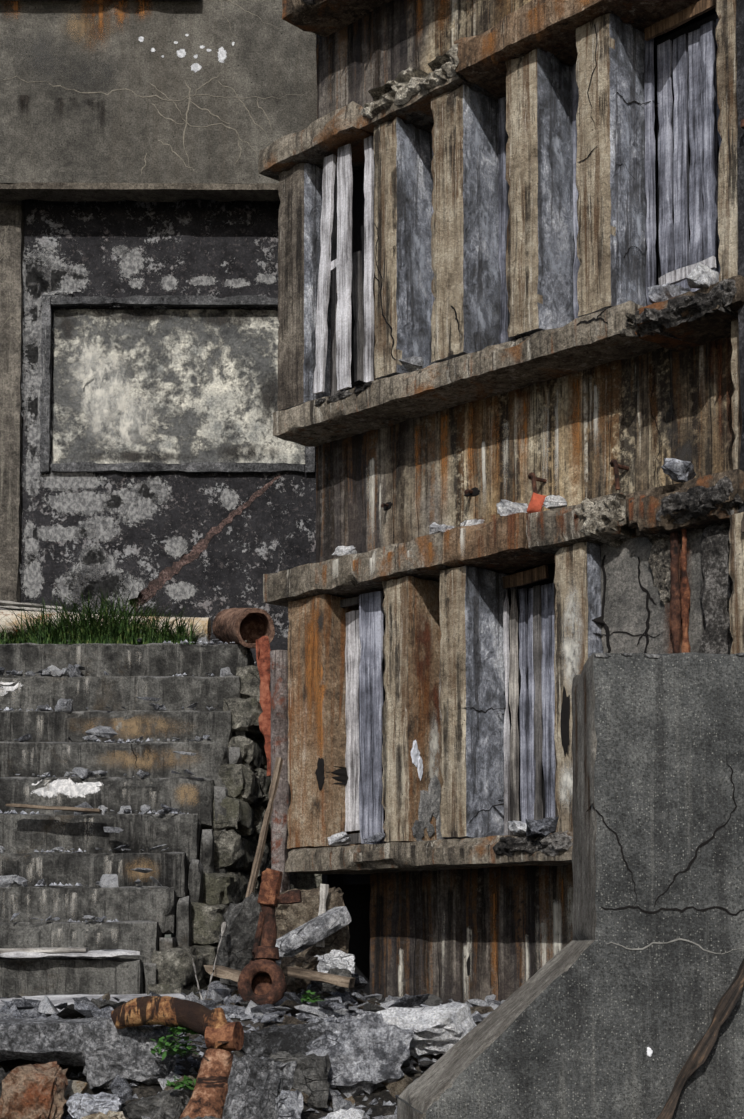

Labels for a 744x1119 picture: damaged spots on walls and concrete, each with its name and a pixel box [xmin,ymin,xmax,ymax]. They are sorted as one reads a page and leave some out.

peeling [139,34,235,72]
spalling [361,43,459,118]
crack [1,72,306,174]
leakage [107,309,169,320]
spalling [620,279,738,341]
leakage [262,382,278,415]
leakage [120,452,174,461]
leakage [223,446,256,457]
spalling [573,494,630,548]
crack [592,555,662,654]
corrosion [668,529,691,654]
crack [586,758,744,954]